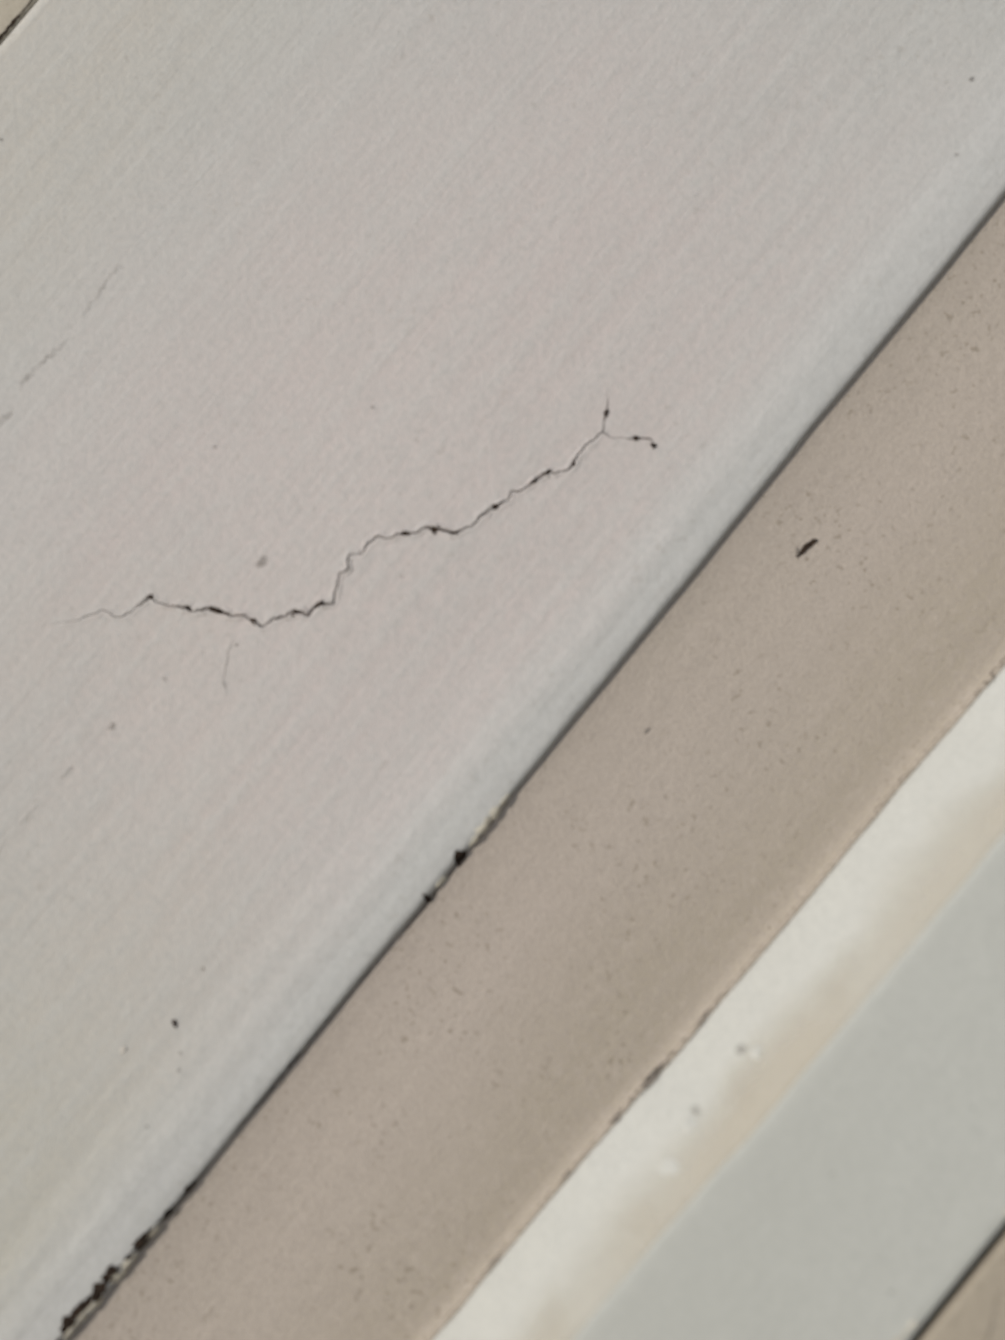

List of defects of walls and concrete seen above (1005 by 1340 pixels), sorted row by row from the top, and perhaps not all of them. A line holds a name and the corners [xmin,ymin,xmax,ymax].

crack [48,403,657,645]